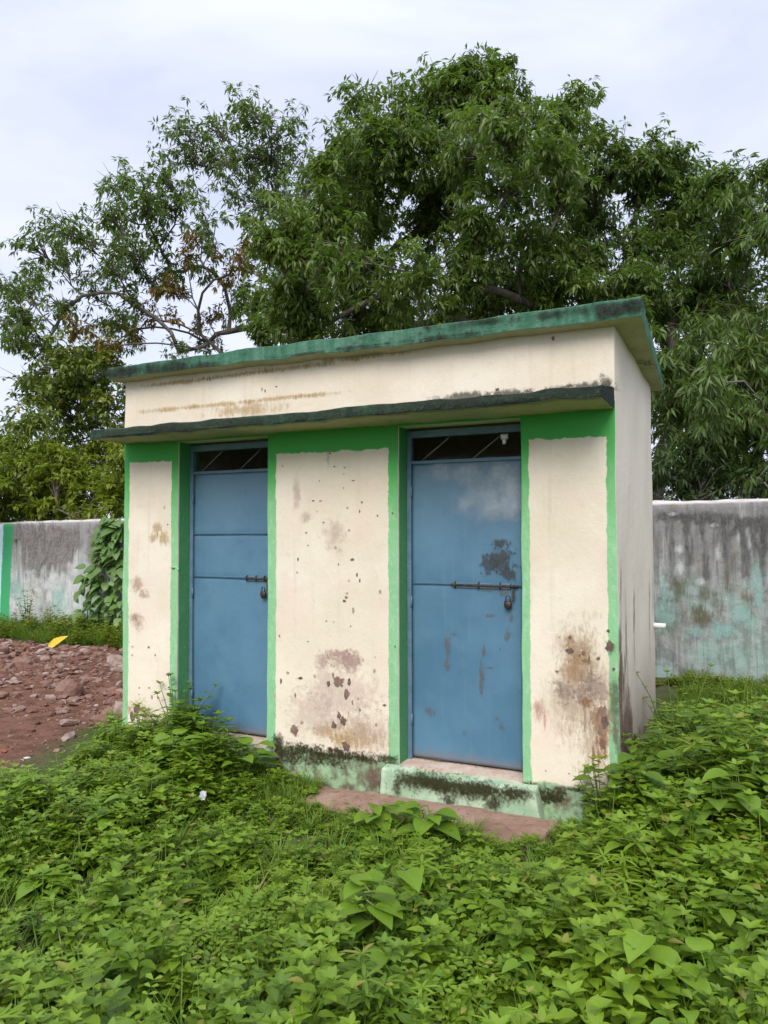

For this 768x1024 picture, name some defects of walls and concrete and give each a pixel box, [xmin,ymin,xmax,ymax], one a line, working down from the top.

mould [538,298,644,319]
leakage [556,375,617,389]
leakage [99,389,545,436]
leakage [16,524,124,588]
leakage [657,511,768,584]